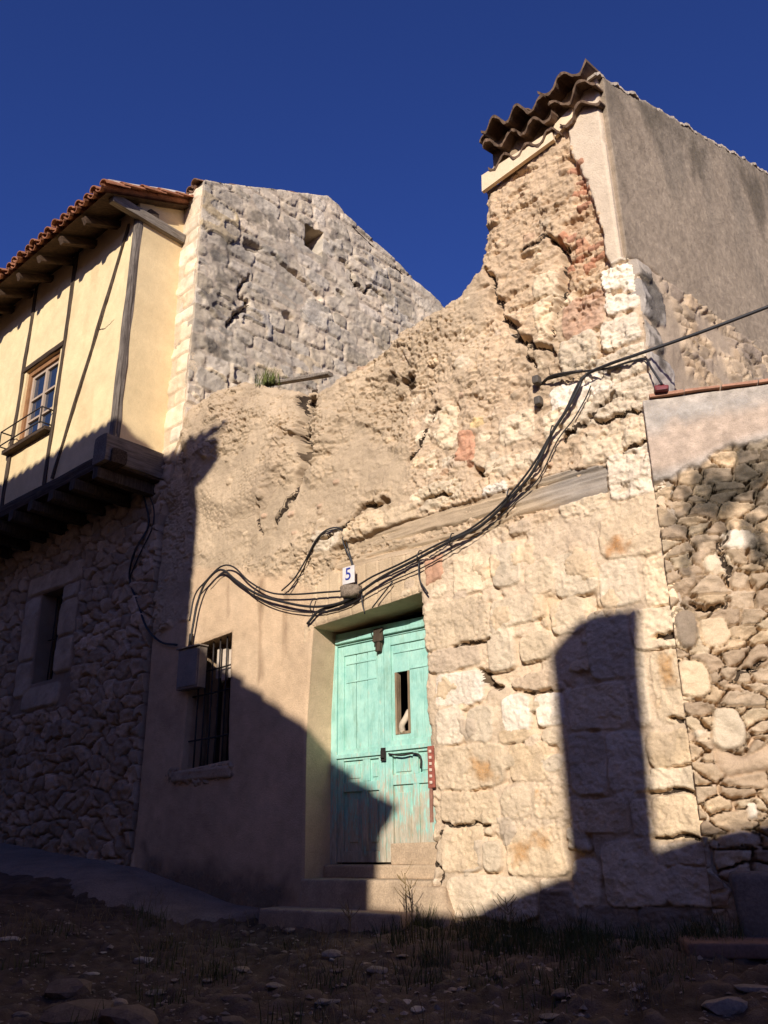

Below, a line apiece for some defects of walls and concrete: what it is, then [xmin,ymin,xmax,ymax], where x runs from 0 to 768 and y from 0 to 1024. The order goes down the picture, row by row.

flaking render [529,245,542,262]
spalling [531,145,607,337]
crack [488,233,571,368]
spalling [386,374,416,392]
spalling [297,452,314,463]
crack [296,389,318,445]
flaking render [425,404,485,478]
crack [256,478,303,534]